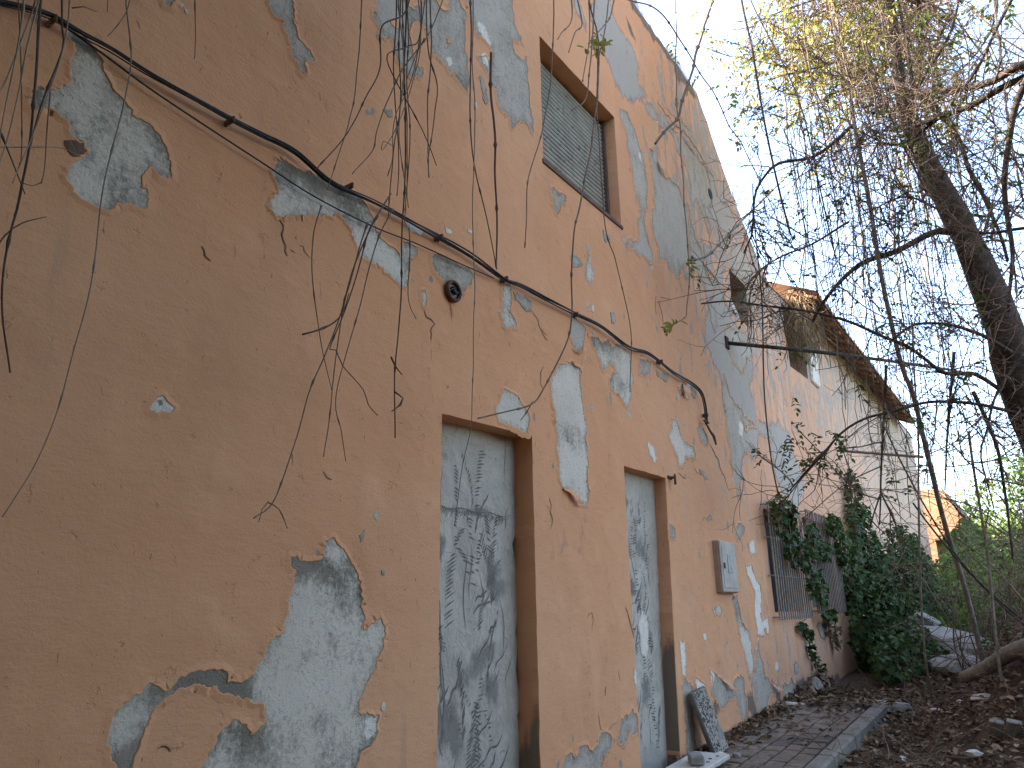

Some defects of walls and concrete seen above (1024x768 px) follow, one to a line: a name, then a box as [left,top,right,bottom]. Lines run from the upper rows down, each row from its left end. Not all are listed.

peeling [19,23,179,218]
peeling [366,0,535,137]
peeling [264,153,476,313]
peeling [570,243,594,285]
peeling [603,105,753,385]
peeling [494,385,536,439]
peeling [548,301,697,510]
peeling [667,374,775,502]
peeling [96,531,390,768]
peeling [680,520,825,757]
peeling [556,703,640,768]